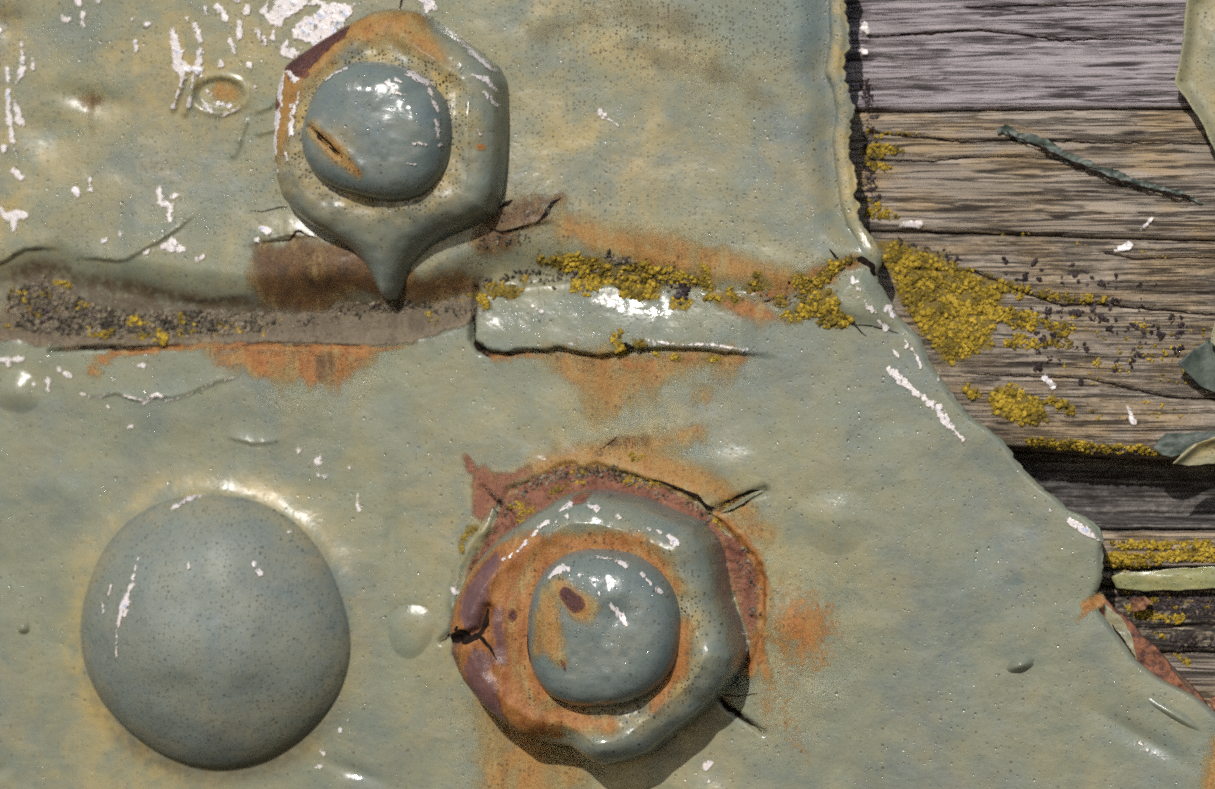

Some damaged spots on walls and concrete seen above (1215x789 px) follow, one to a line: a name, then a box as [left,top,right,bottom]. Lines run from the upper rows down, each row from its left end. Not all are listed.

peeling [0,36,35,153]
peeling [169,0,355,173]
corrosion [274,8,444,159]
peeling [0,206,28,235]
peeling [143,185,205,263]
corrosion [88,341,403,387]
corrosion [247,234,385,310]
crack [472,286,634,358]
corrosion [471,193,861,324]
peeling [886,334,965,443]
crack [651,479,767,514]
corrosion [450,426,837,789]